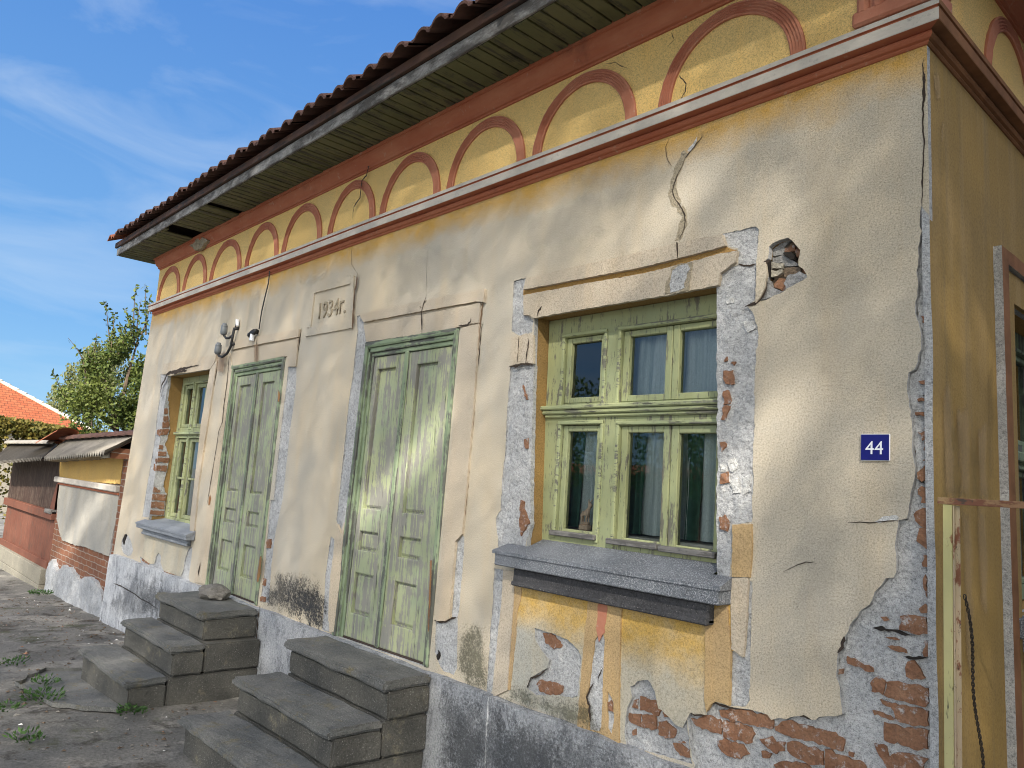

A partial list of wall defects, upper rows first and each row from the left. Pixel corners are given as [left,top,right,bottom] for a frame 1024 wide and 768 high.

crack [665,137,702,257]
flaking render [143,375,171,517]
flaking render [497,365,537,547]
flaking render [627,227,930,768]
leakage [265,574,326,630]
flaking render [529,604,614,733]